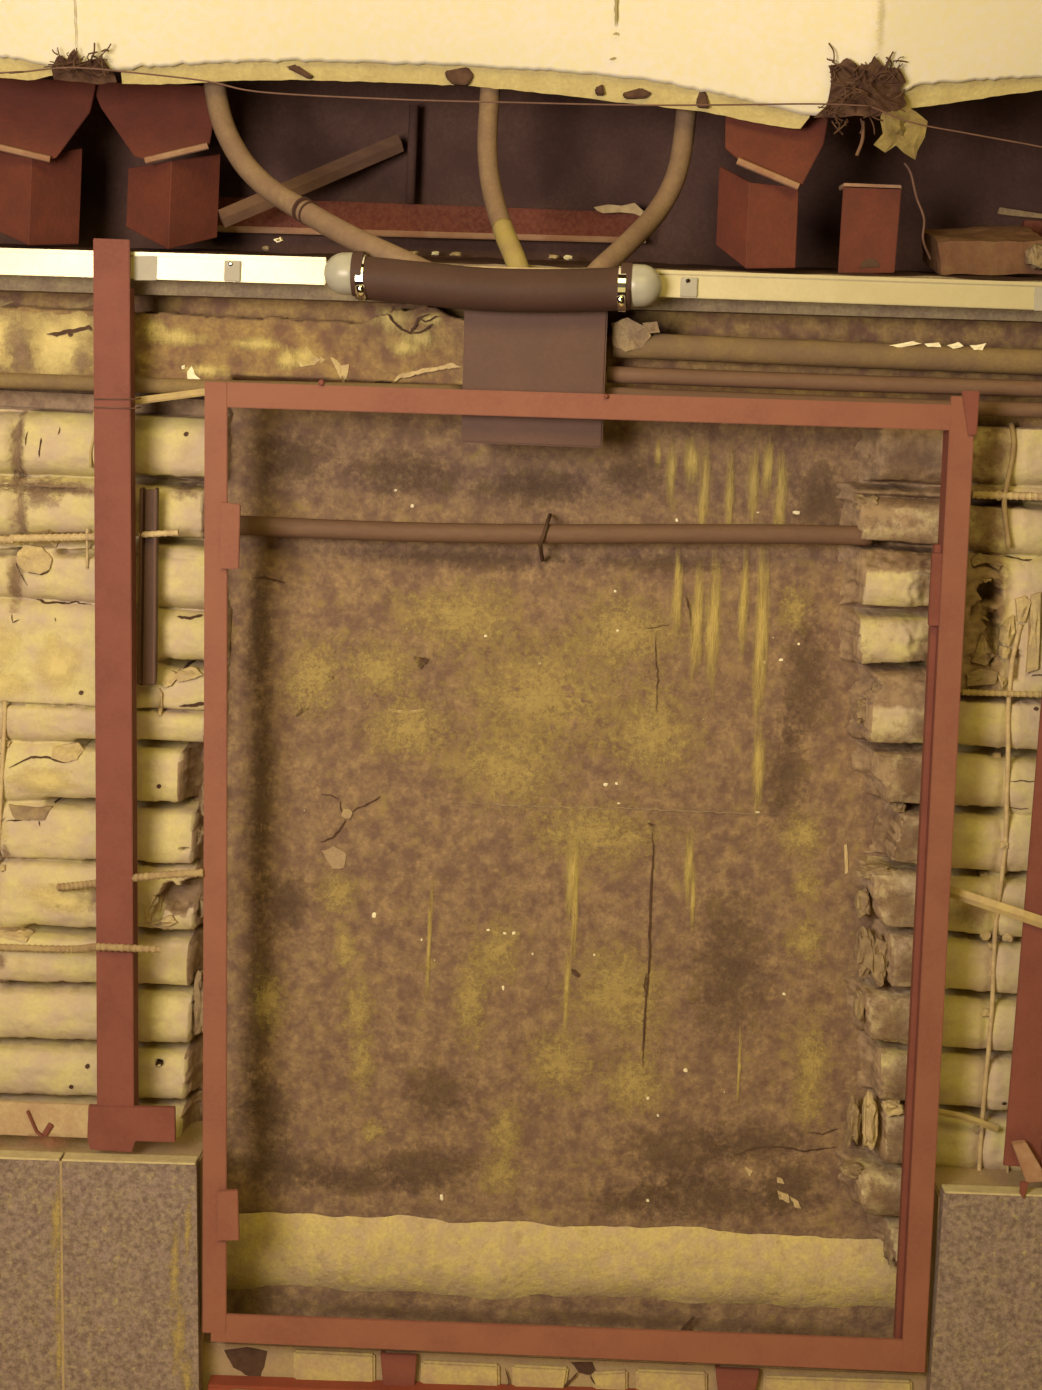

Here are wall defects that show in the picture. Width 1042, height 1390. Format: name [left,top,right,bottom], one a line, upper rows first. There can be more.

spalling [44,43,117,84]
crack [609,0,618,60]
spalling [814,43,928,159]
flaking render [594,203,644,216]
spalling [139,529,179,538]
damp [613,442,787,524]
damp [739,552,807,714]
flaking render [961,592,1042,698]
damp [279,550,720,1118]
damp [753,735,824,900]
crack [642,823,655,1061]
damp [480,1106,520,1195]